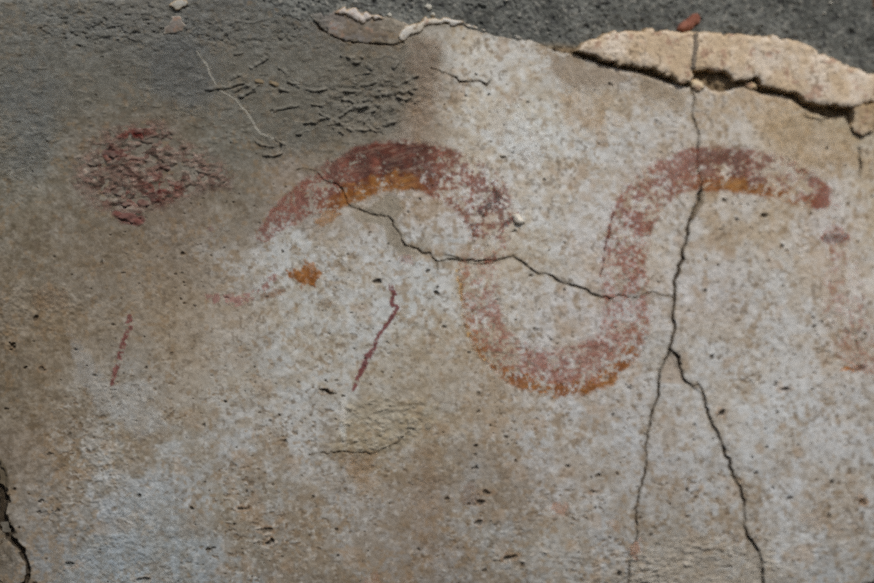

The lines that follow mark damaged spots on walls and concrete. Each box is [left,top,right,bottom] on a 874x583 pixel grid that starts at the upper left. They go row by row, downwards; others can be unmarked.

spalling [326,6,464,44]
crack [690,32,699,69]
crack [550,275,609,300]
crack [647,119,746,506]
crack [0,458,31,583]
crack [635,463,647,524]